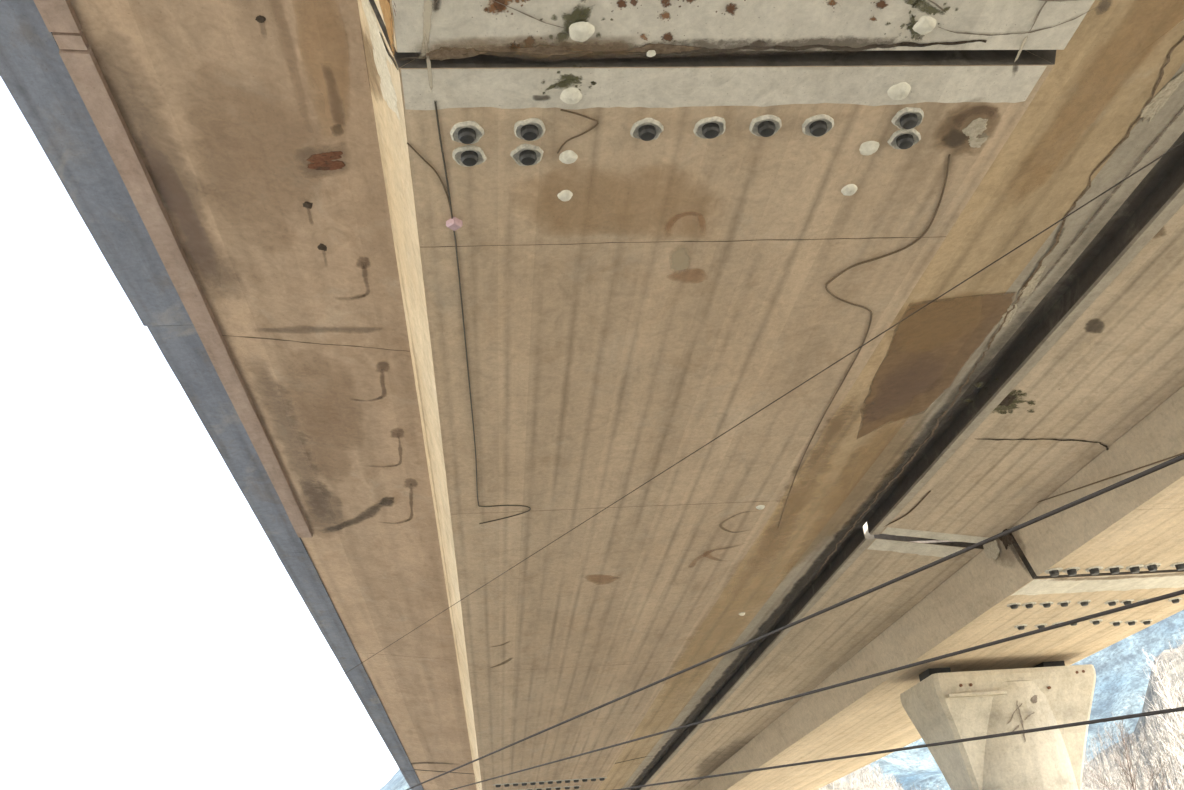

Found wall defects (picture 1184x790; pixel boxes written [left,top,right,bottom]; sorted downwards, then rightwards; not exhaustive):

corrosion [472,0,530,18]
corrosion [660,0,699,42]
crack [379,0,1098,70]
damp [629,106,1184,790]
crack [983,439,1109,450]
damp [329,498,393,530]